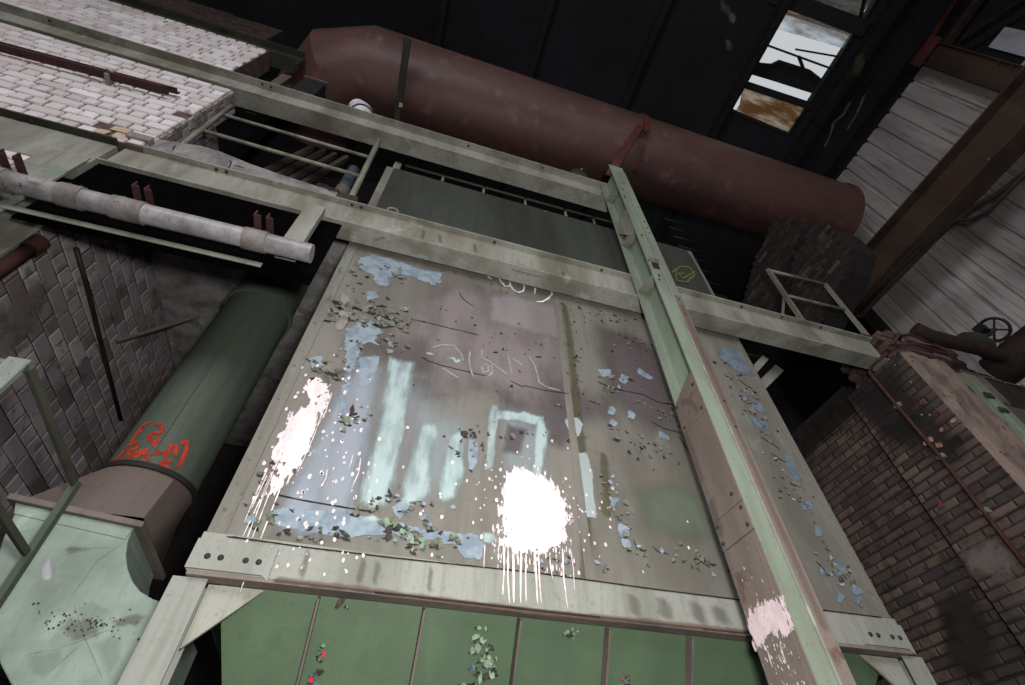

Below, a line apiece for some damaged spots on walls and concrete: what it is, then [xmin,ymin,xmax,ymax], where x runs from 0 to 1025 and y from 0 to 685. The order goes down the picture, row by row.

peeling [302,254,507,433]
peeling [561,296,680,470]
peeling [239,461,484,560]
peeling [522,545,576,576]
peeling [599,472,730,577]
peeling [713,348,864,607]